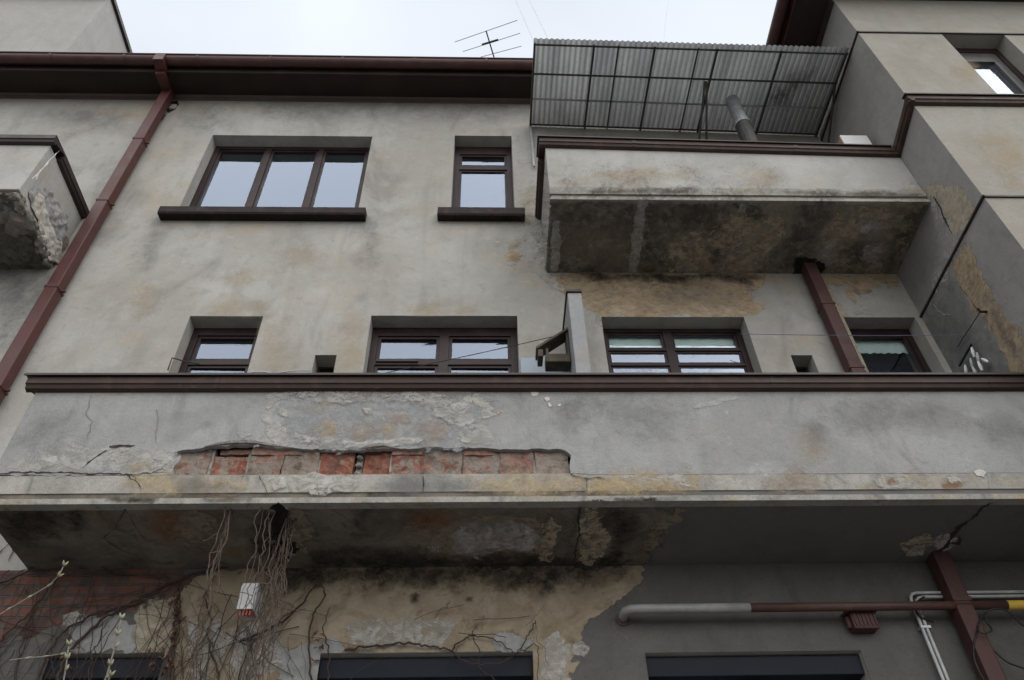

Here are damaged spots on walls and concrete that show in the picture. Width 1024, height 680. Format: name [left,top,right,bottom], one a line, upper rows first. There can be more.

spalling [0,188,69,269]
water stain [534,186,753,273]
spalling [792,180,975,372]
crack [0,400,167,484]
flaking render [0,391,684,680]
water stain [271,472,697,602]
spalling [900,533,958,556]
crack [934,503,991,552]